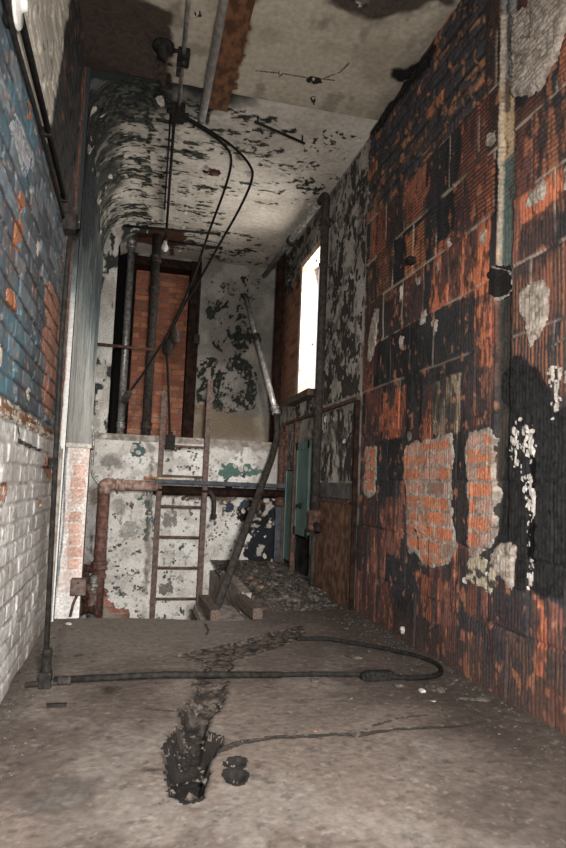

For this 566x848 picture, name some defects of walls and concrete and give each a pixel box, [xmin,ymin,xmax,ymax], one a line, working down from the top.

peeling [9,101,34,177]
peeling [11,190,26,255]
peeling [86,80,368,481]
peeling [0,281,61,446]
spalling [100,492,200,618]
peeling [164,447,263,488]
peeling [206,497,275,562]
flaking render [363,446,377,498]
flaking render [402,427,503,595]
peeling [509,417,537,547]
crack [144,622,486,805]